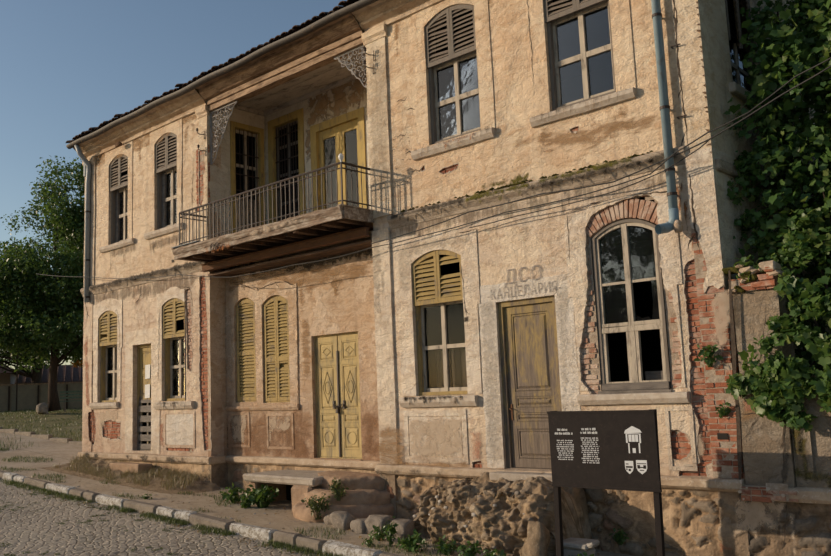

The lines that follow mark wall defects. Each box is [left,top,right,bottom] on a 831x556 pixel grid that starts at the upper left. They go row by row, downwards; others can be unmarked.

flaking render [196,131,210,211]
leakage [539,113,652,146]
crack [630,175,700,252]
crack [673,0,690,153]
flaking render [89,409,121,445]
flaking render [184,274,212,452]
flaking render [581,194,658,394]
flaking render [660,229,799,503]